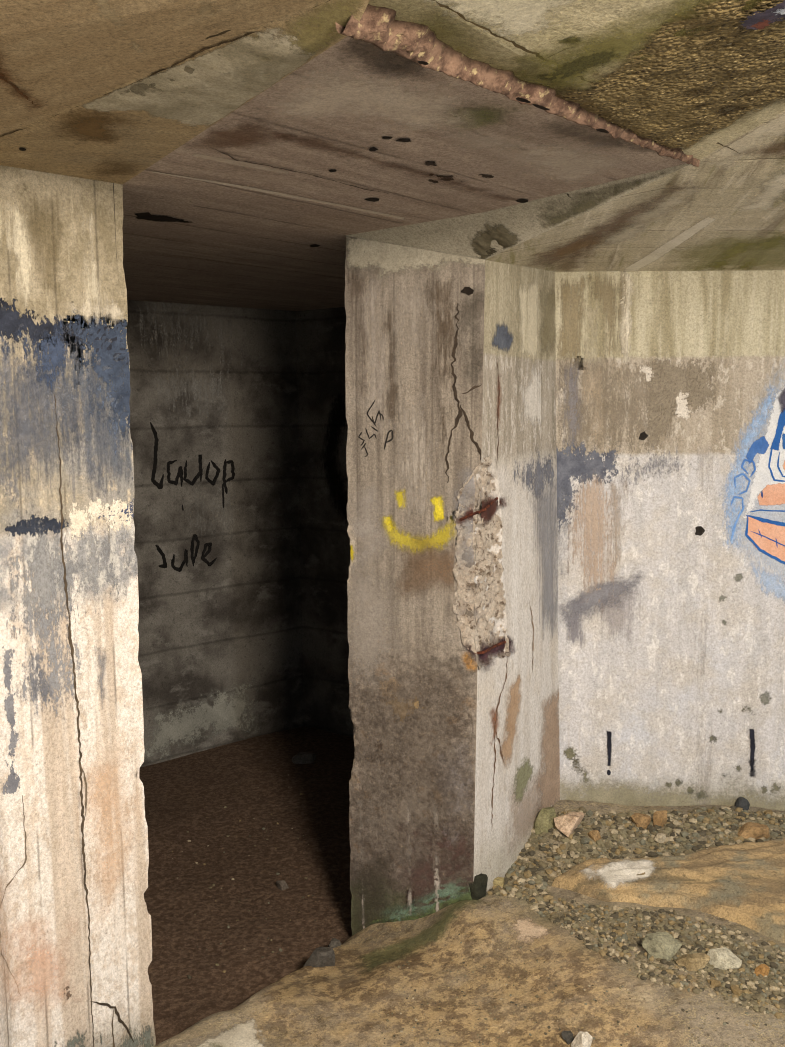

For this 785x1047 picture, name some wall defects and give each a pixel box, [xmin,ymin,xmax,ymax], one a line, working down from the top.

crack [432,0,573,57]
rust [0,68,40,108]
crack [103,30,257,96]
damp [607,189,695,243]
damp [740,171,785,210]
crack [445,303,482,483]
rust [457,496,507,523]
spalling [452,456,511,670]
rust [464,636,515,670]
crack [54,394,134,1047]
damp [355,806,473,929]